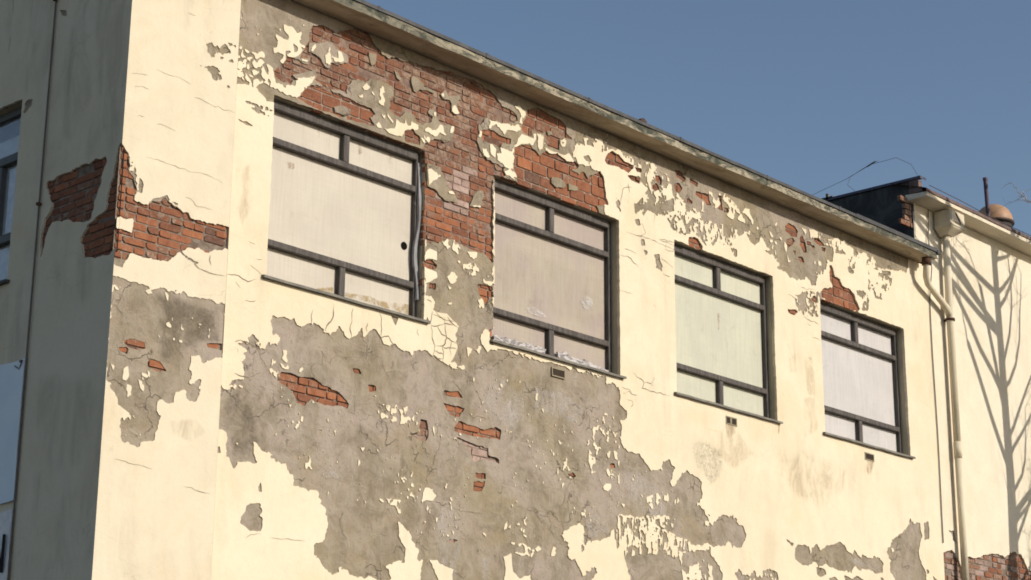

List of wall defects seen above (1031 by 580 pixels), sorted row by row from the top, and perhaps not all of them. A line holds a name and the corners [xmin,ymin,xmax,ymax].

flaking render [897,195,913,228]
peeling [42,143,228,447]
peeling [205,0,908,580]
crack [417,299,486,419]
peeling [787,520,1031,580]